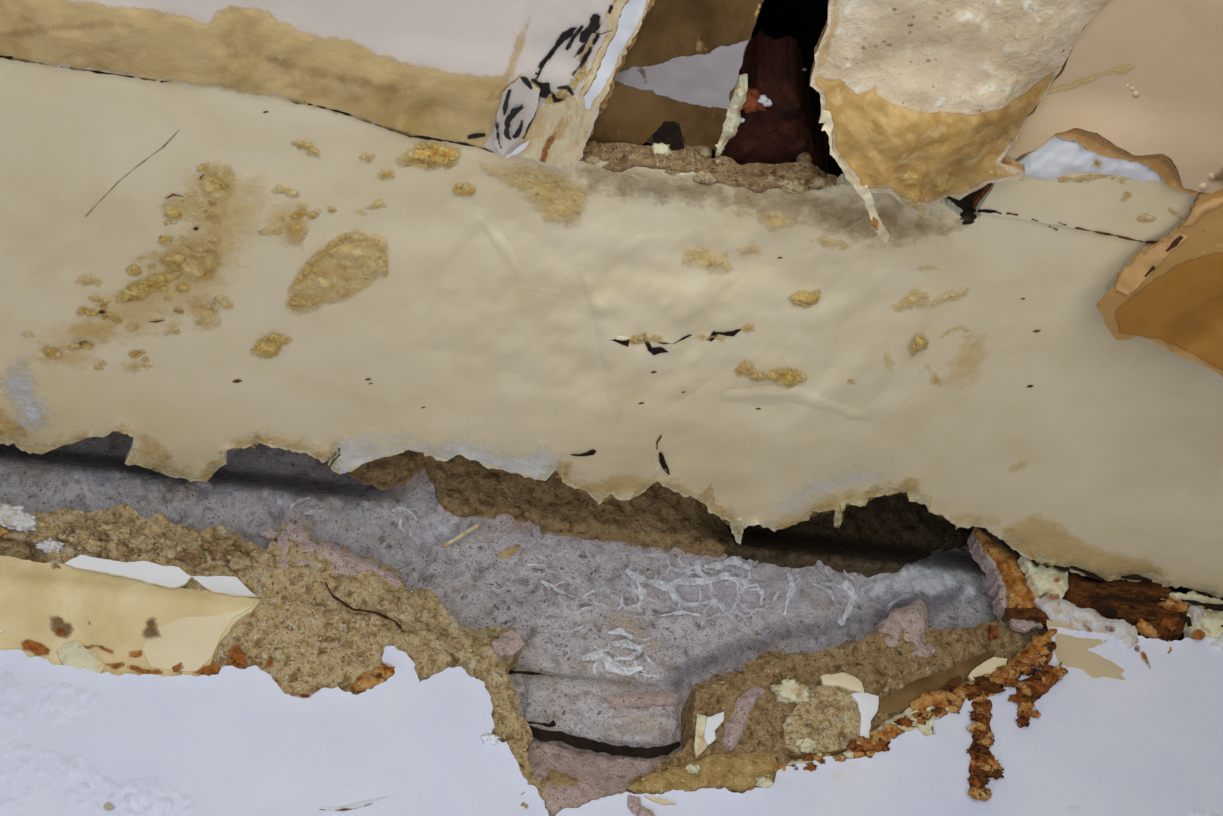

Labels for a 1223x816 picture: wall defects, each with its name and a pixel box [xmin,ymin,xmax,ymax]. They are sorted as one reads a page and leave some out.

damp [0,0,613,149]
spalling [579,74,837,194]
spalling [972,183,992,210]
peeling [1015,128,1223,377]
spalling [329,439,984,577]
spalling [0,503,1148,816]
corrosion [777,527,1068,801]
spalling [1169,591,1223,652]